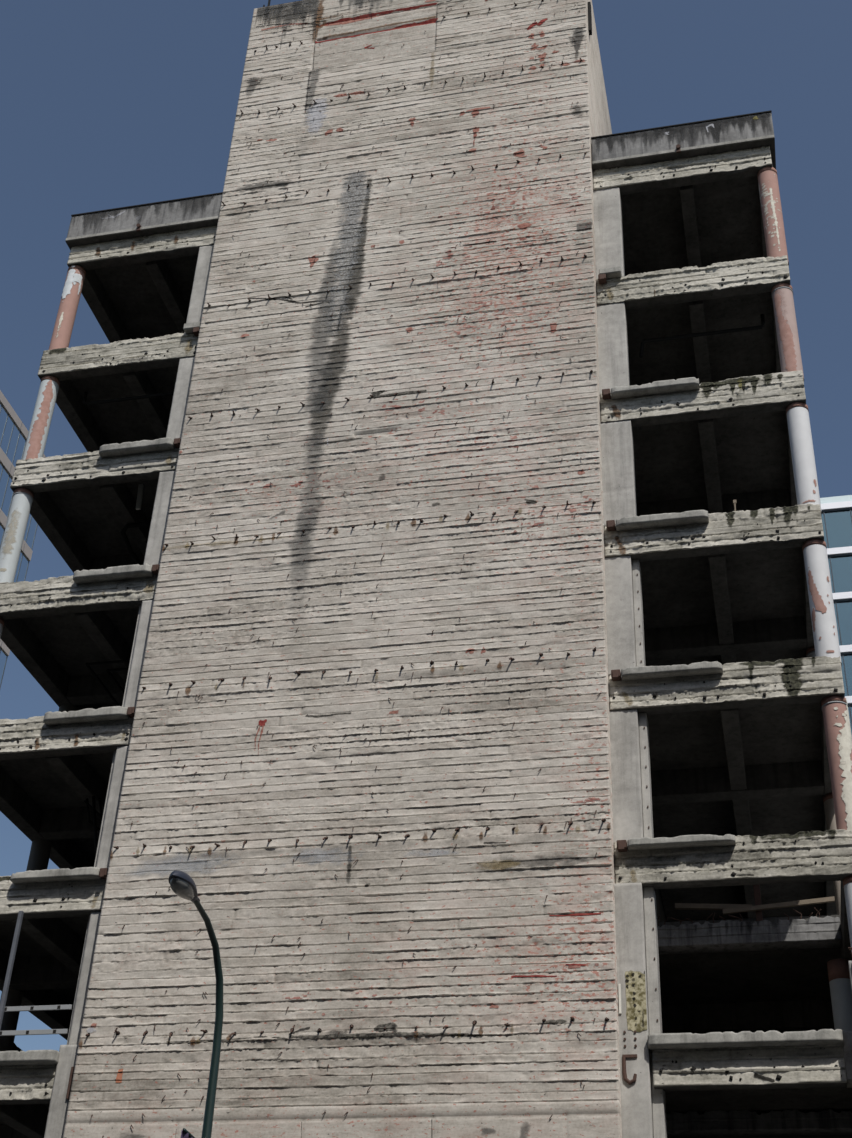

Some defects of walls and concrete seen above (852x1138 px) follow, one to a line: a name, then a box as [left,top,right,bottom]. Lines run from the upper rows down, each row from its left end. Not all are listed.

leakage [257,0,318,31]
leakage [597,114,770,149]
leakage [310,171,372,438]
peeling [774,290,797,372]
peeling [25,380,53,461]
leakage [750,505,810,524]
peeling [808,570,835,653]
leakage [740,657,815,681]